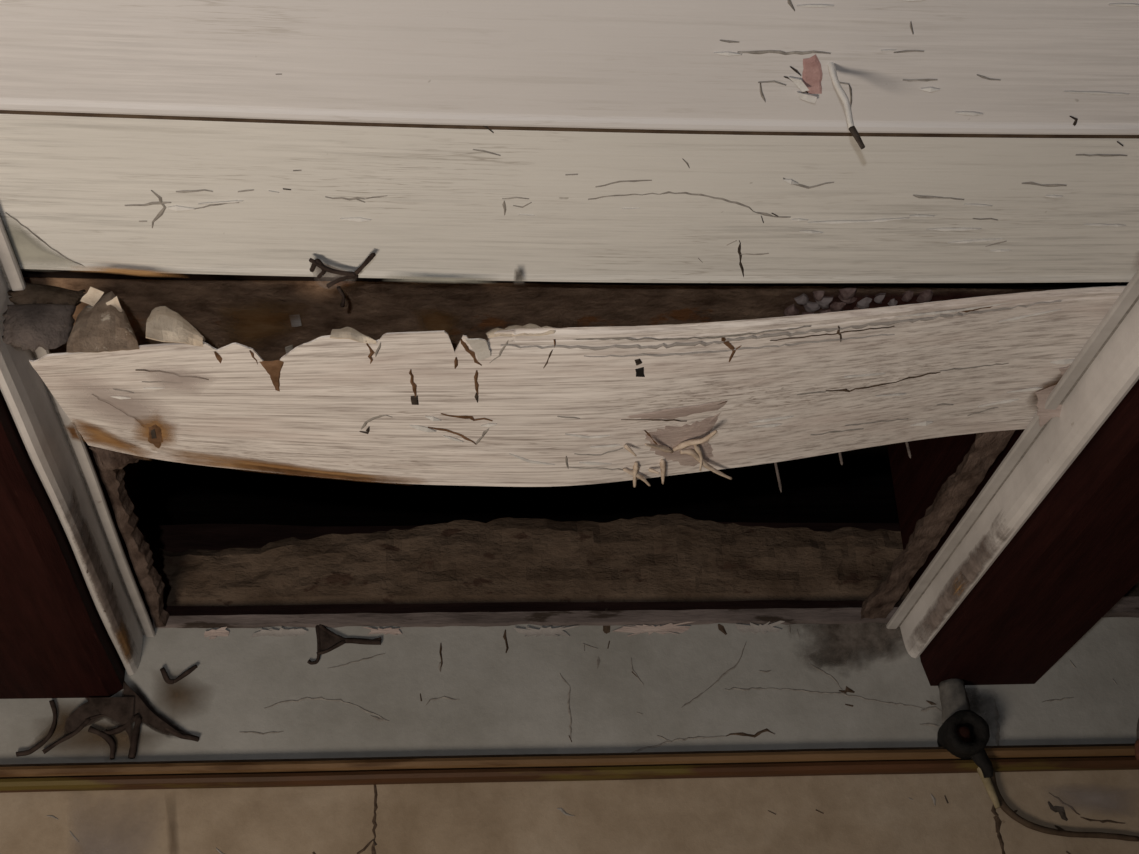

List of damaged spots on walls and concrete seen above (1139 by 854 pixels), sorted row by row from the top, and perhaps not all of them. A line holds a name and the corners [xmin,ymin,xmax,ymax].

peeling [758,54,865,149]
peeling [783,178,834,189]
peeling [66,287,205,353]
spalling [783,286,999,316]
peeling [330,327,381,364]
peeling [454,323,556,369]
crack [357,785,378,854]
crack [991,805,1005,854]